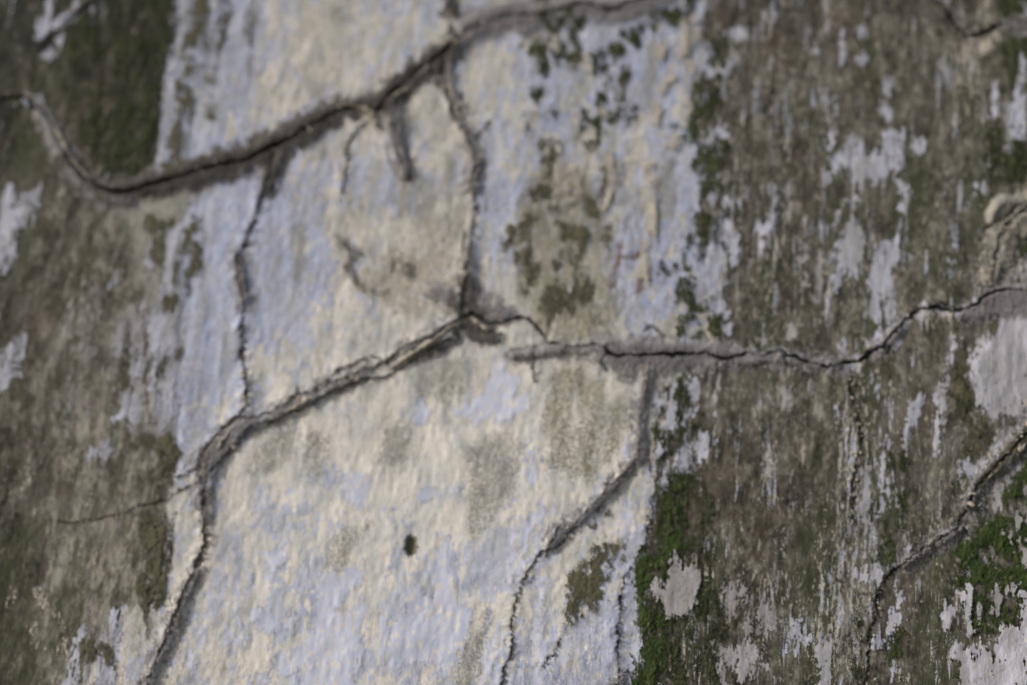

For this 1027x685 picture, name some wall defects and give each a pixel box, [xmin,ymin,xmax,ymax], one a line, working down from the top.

crack [0,0,679,236]
water stain [107,173,220,328]
crack [123,155,1027,685]
water stain [646,366,723,492]
peeling [850,308,1027,685]